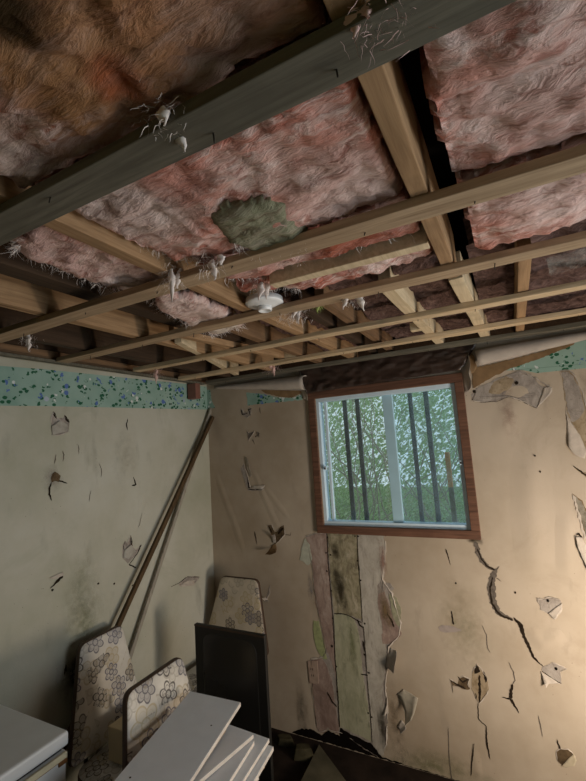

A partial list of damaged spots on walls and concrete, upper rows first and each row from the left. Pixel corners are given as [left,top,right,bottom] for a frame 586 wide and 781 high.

peeling [300,533,418,757]
crack [471,704,490,774]
crack [474,542,543,666]
crack [502,663,519,713]